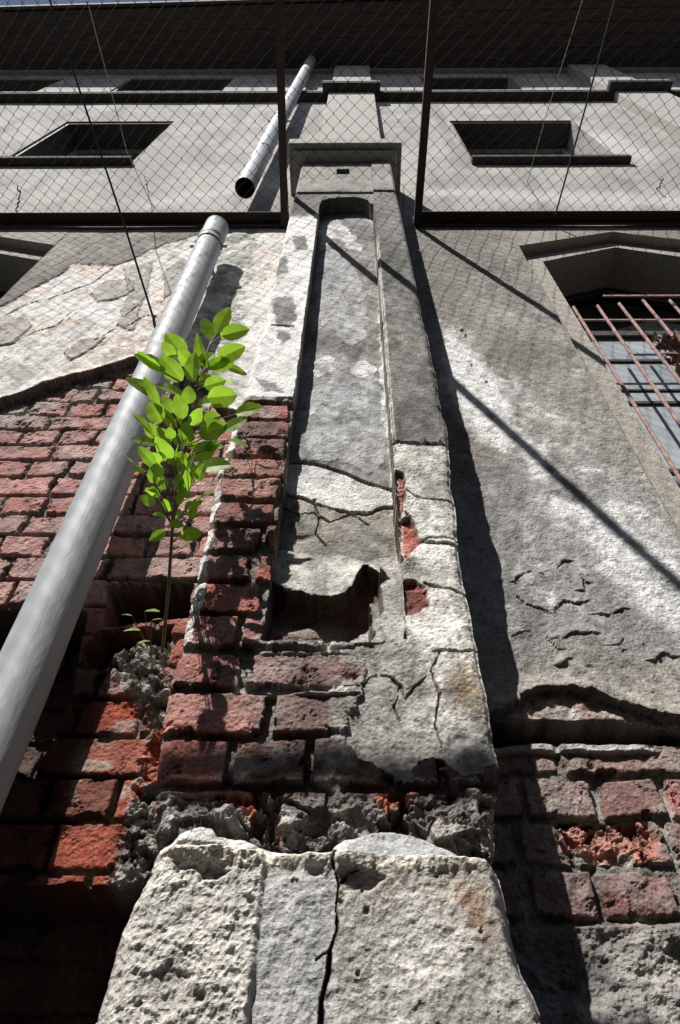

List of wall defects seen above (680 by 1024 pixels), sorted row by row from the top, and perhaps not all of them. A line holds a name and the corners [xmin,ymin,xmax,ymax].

crack [283,494,370,546]
flaking render [0,222,680,1024]
crack [362,648,477,748]
crack [510,558,626,667]
crack [653,650,673,659]
crack [315,849,343,1024]